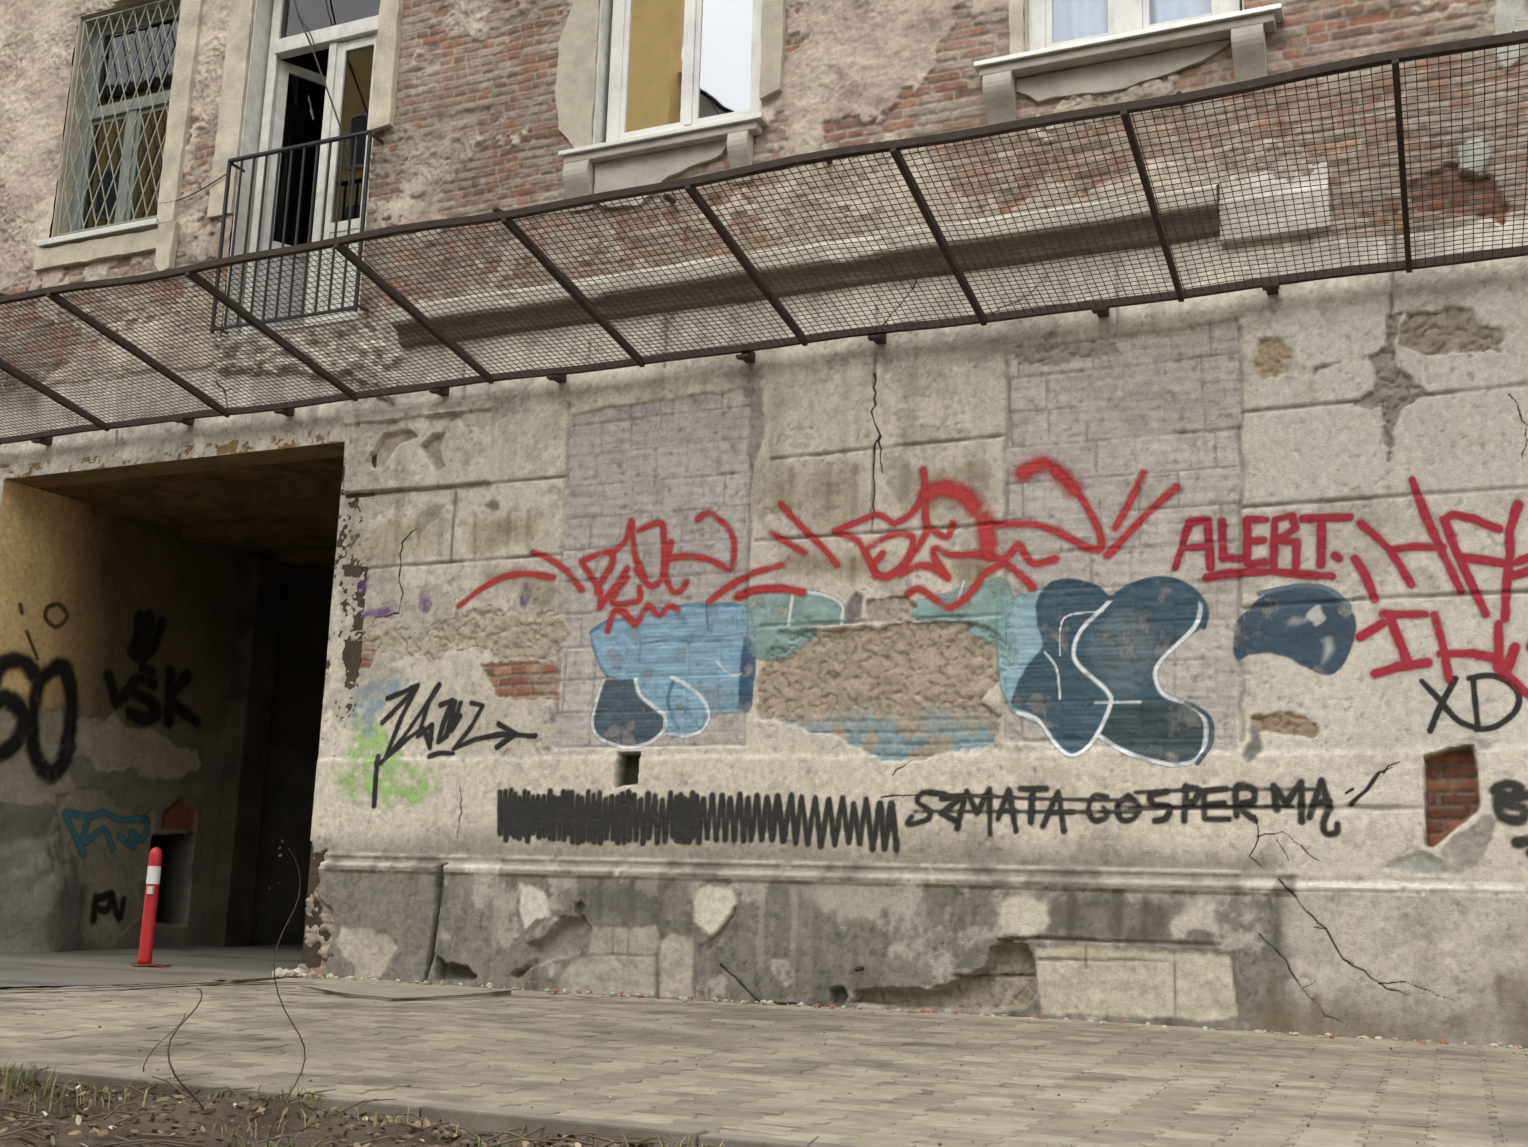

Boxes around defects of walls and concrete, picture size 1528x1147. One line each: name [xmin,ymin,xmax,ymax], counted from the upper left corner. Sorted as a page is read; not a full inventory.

spalling [1491,0,1528,75]
flaking render [1407,136,1516,225]
flaking render [1250,331,1345,382]
flaking render [1350,303,1511,465]
flaking render [342,600,574,702]
flaking render [754,587,1010,763]
spalling [1378,731,1502,897]
flaking render [299,843,479,983]
flaking render [499,878,741,1000]
crack [1249,815,1452,1020]